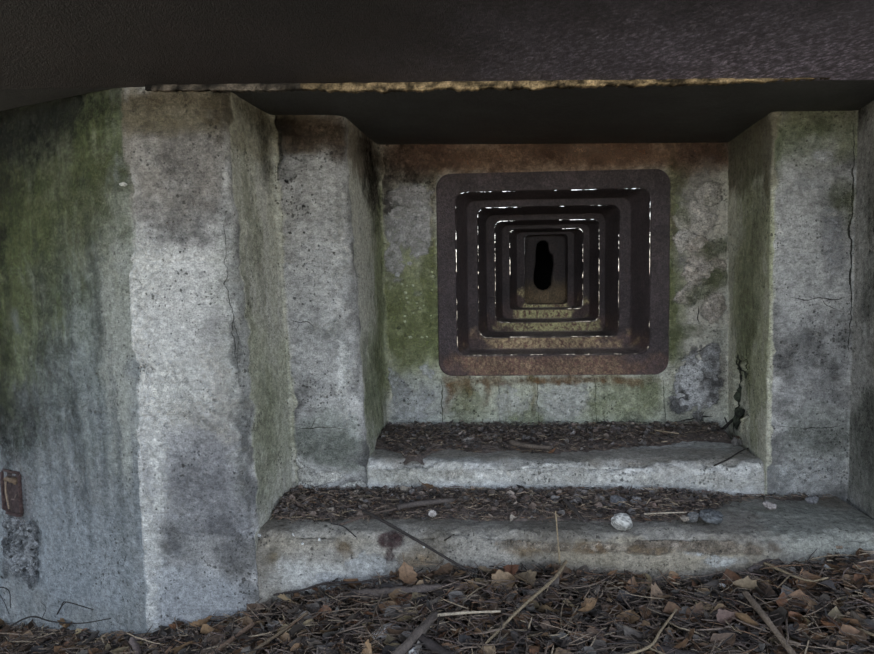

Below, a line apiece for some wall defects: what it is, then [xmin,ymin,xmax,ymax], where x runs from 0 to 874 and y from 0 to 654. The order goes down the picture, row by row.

crack [223,218,240,385]
crack [792,126,855,350]
spalling [0,514,40,589]